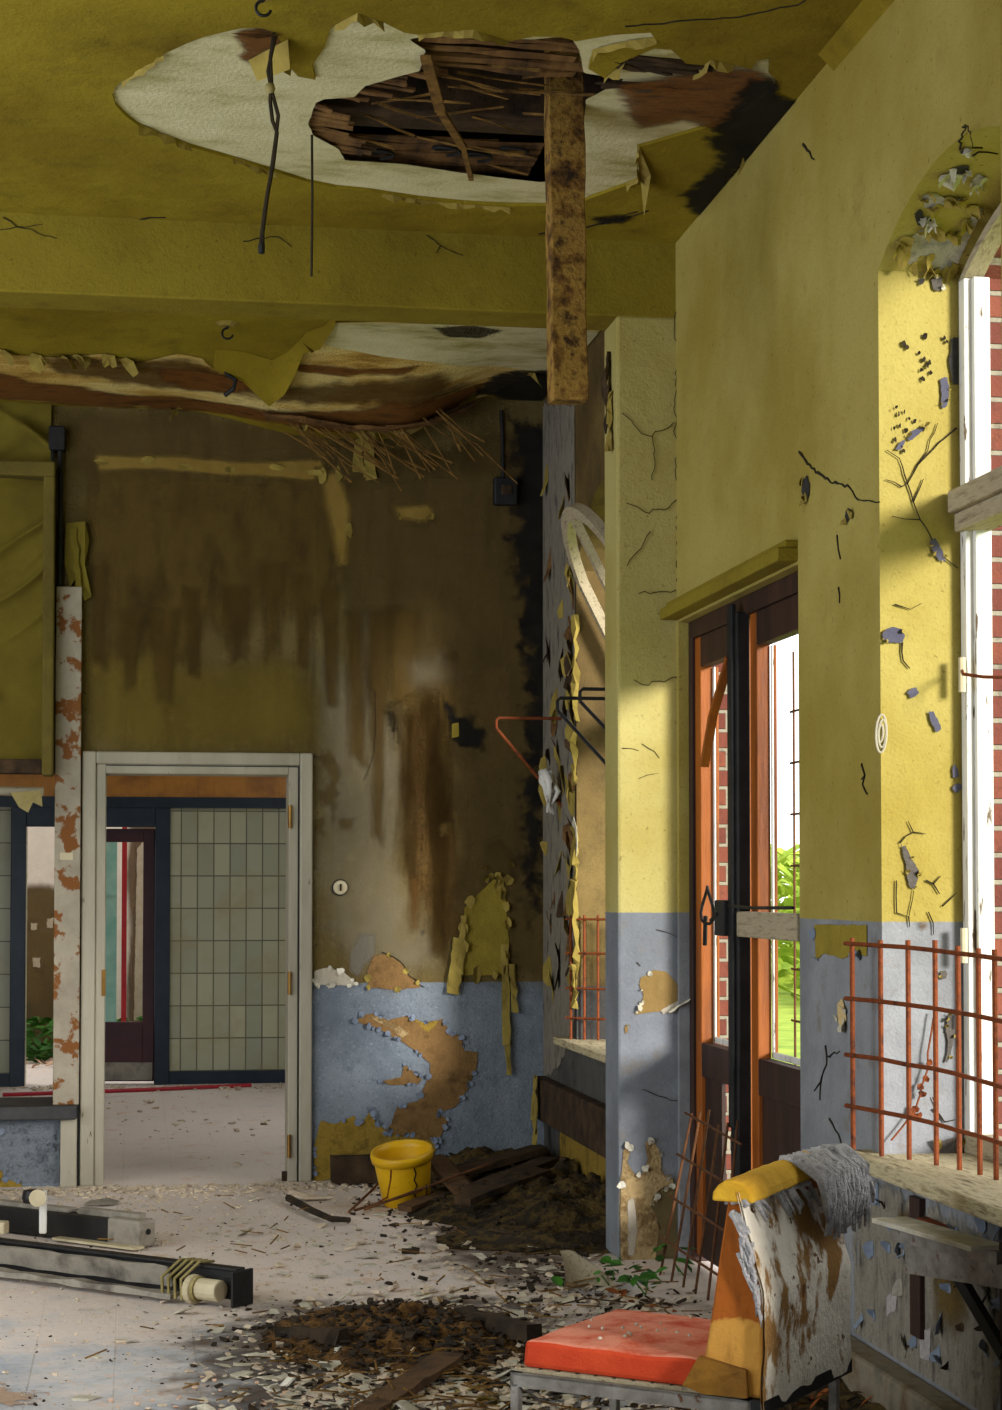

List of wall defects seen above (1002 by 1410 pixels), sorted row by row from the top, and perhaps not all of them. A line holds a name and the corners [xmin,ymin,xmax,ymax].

peeling [113,13,551,214]
peeling [574,33,776,214]
peeling [893,148,988,291]
crack [798,423,958,568]
peeling [0,320,581,1145]
leakage [73,417,543,978]
spalling [875,714,888,753]
peeling [882,627,905,643]
peeling [625,970,691,1033]
peeling [312,1011,478,1181]
spalling [410,1132,676,1336]
peeling [173,1307,396,1410]